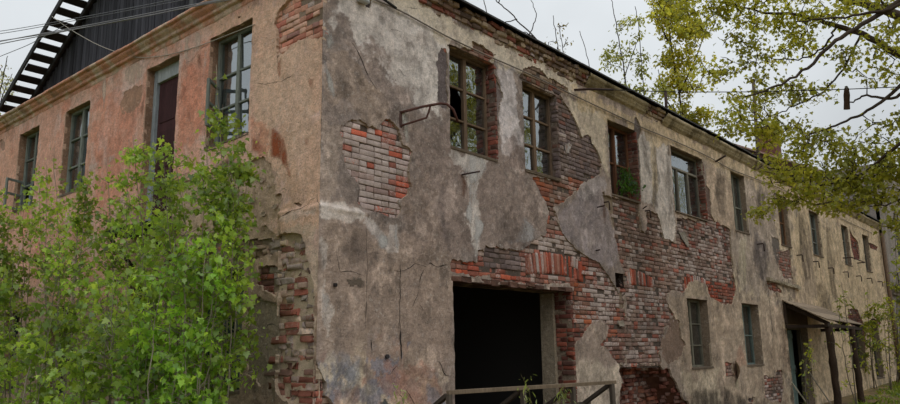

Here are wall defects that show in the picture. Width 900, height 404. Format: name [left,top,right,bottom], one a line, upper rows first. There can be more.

flaking render [276,0,328,54]
flaking render [340,119,411,218]
flaking render [418,0,736,403]
flaking render [164,157,329,404]
flaking render [768,236,792,293]
crack [390,263,445,403]
flaking render [764,370,783,403]